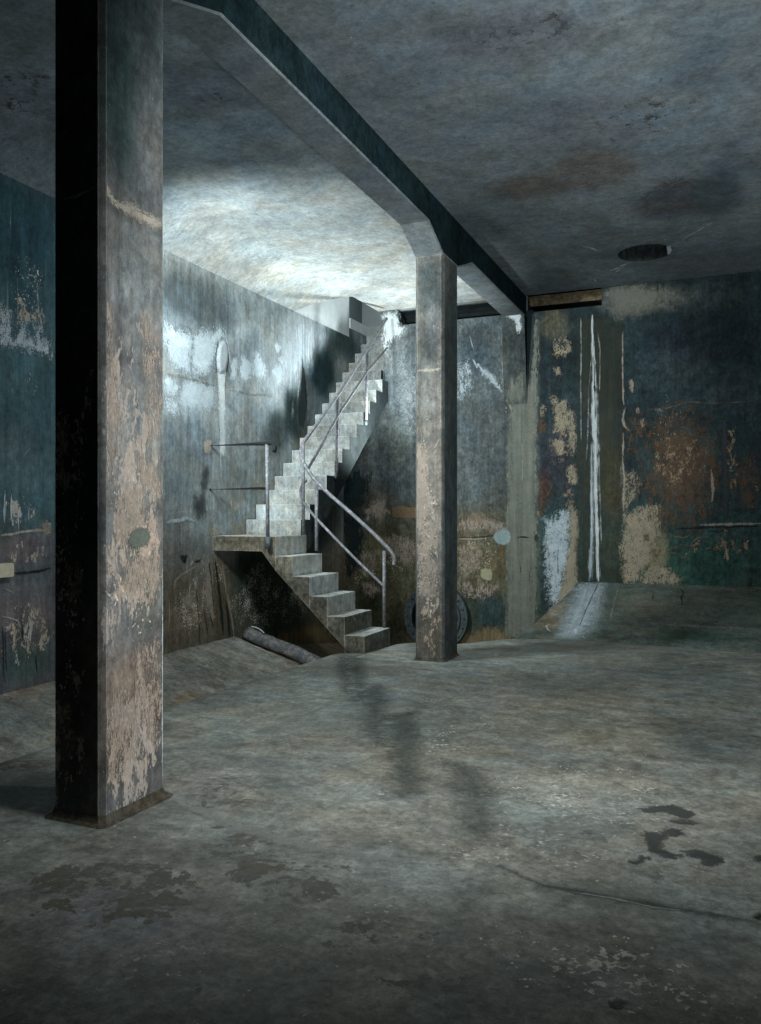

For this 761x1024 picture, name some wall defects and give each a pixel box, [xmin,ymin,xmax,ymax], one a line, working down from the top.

water stain [274,319,326,428]
peeling [552,336,572,376]
peeling [540,394,578,485]
peeling [618,335,685,585]
peeling [107,293,228,777]
water stain [630,804,725,867]